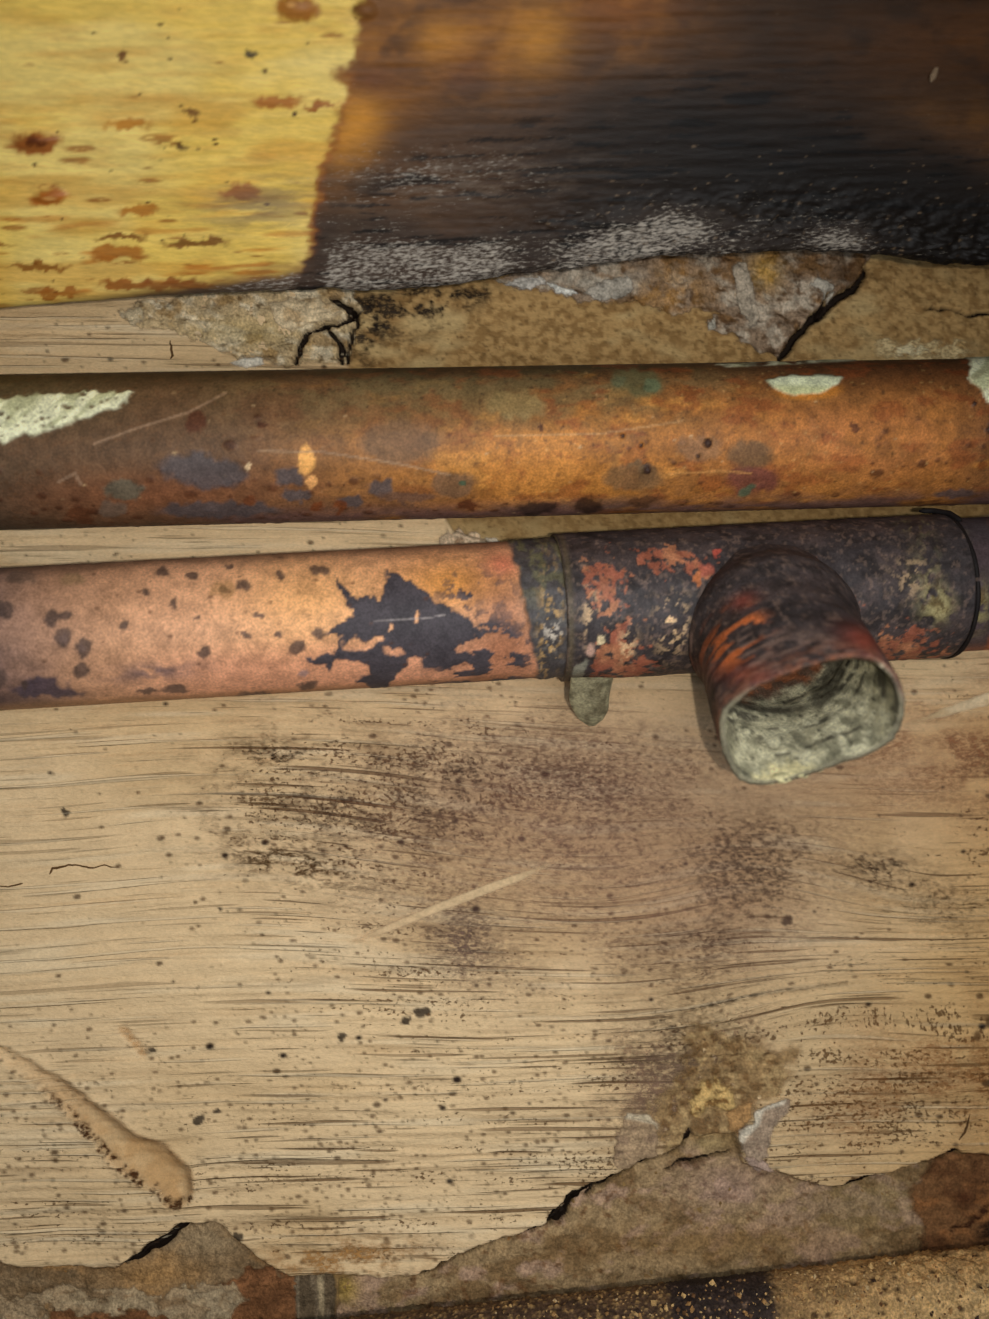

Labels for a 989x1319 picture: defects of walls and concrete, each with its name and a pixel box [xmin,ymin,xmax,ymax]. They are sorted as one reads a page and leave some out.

spalling [118,287,362,368]
crack [295,300,360,363]
spalling [496,249,871,356]
crack [777,271,865,361]
leakage [243,848,339,877]
leakage [625,1044,727,1116]
spalling [74,1103,192,1210]
crack [527,1128,727,1230]
spalling [335,1024,989,1319]
spalling [0,1221,298,1319]
crack [126,1222,190,1263]